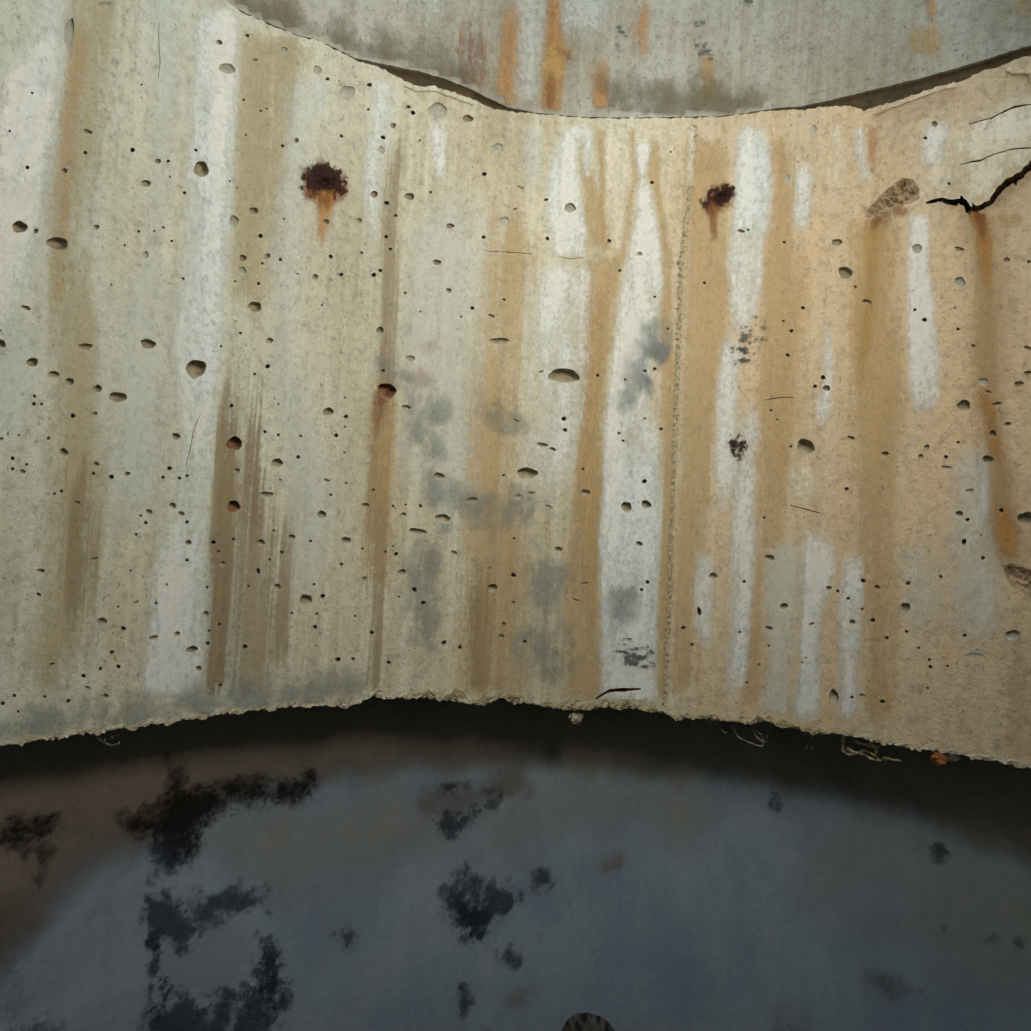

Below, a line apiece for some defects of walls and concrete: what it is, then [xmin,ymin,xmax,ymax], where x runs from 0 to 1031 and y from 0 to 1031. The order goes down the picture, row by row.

rust [543,0,566,108]
crack [969,104,1031,125]
rust [301,162,348,237]
rust [700,183,737,234]
spalling [864,178,920,216]
crack [926,147,1031,215]
water stain [537,127,811,701]
water stain [855,215,938,499]
rust [971,212,1016,554]
spalling [1003,563,1031,597]
water stain [120,767,317,873]
water stain [141,887,294,1031]